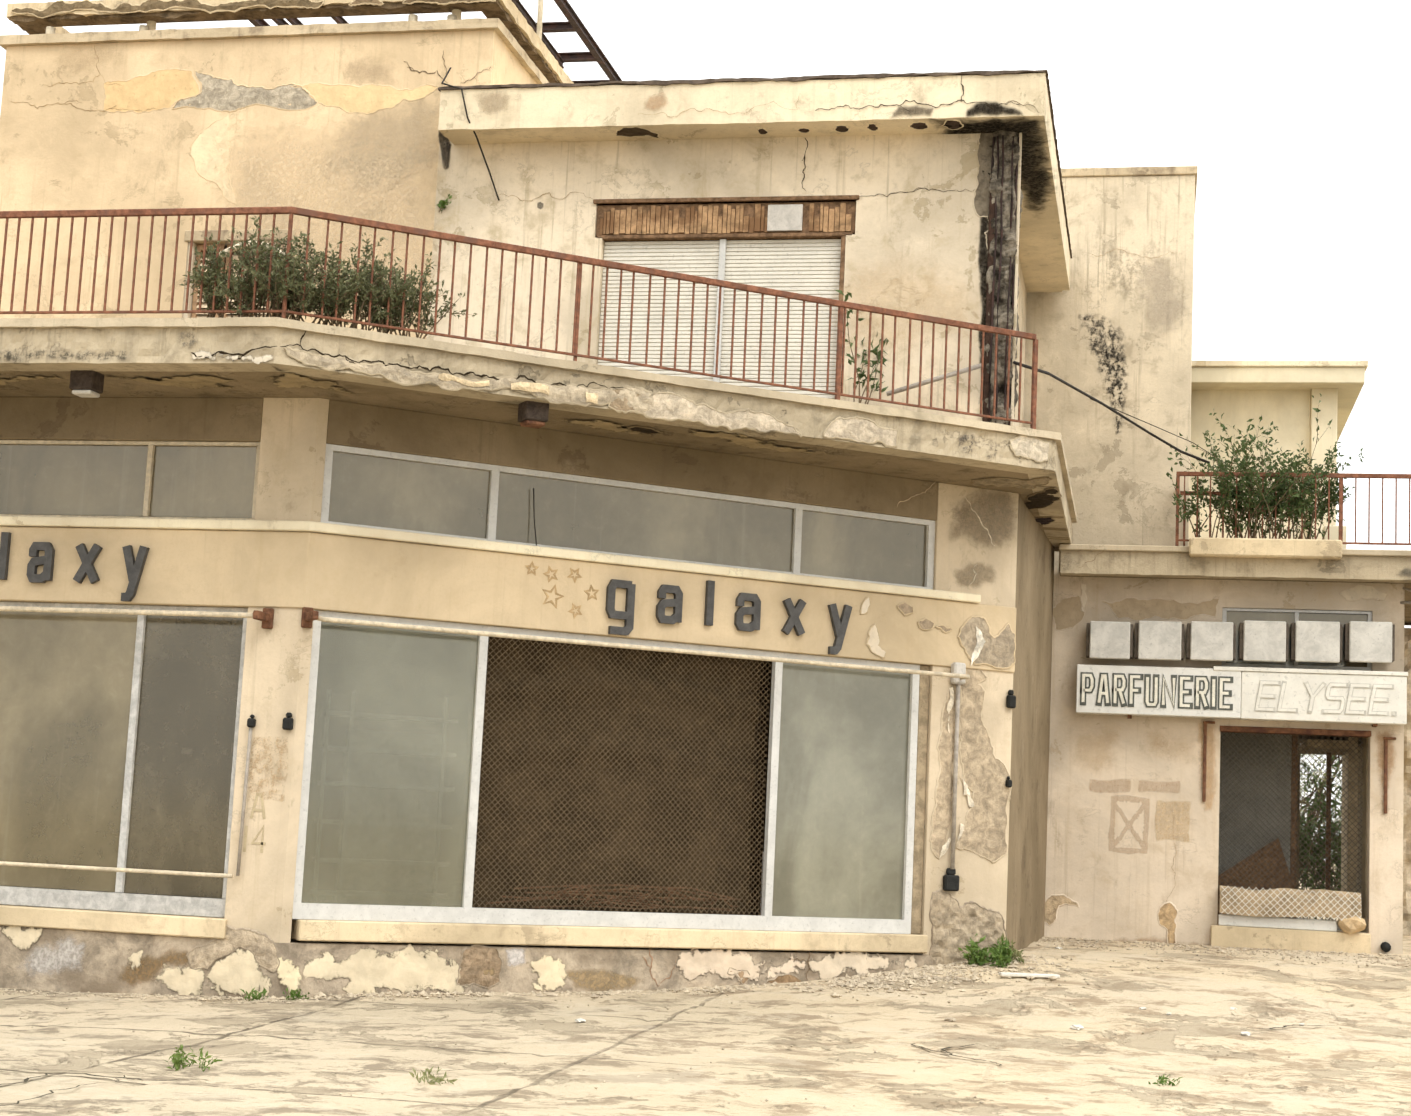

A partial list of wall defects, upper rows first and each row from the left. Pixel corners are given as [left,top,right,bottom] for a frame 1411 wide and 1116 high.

spalling [10,0,324,18]
crack [13,46,159,112]
flaking render [103,68,439,205]
crack [642,76,1039,189]
water stain [979,217,988,400]
spalling [190,346,898,456]
peeling [1053,583,1220,631]
flaking render [897,601,1016,864]
peeling [0,926,43,950]
peeling [128,949,143,970]
peeling [155,925,503,998]
peeling [526,955,568,992]